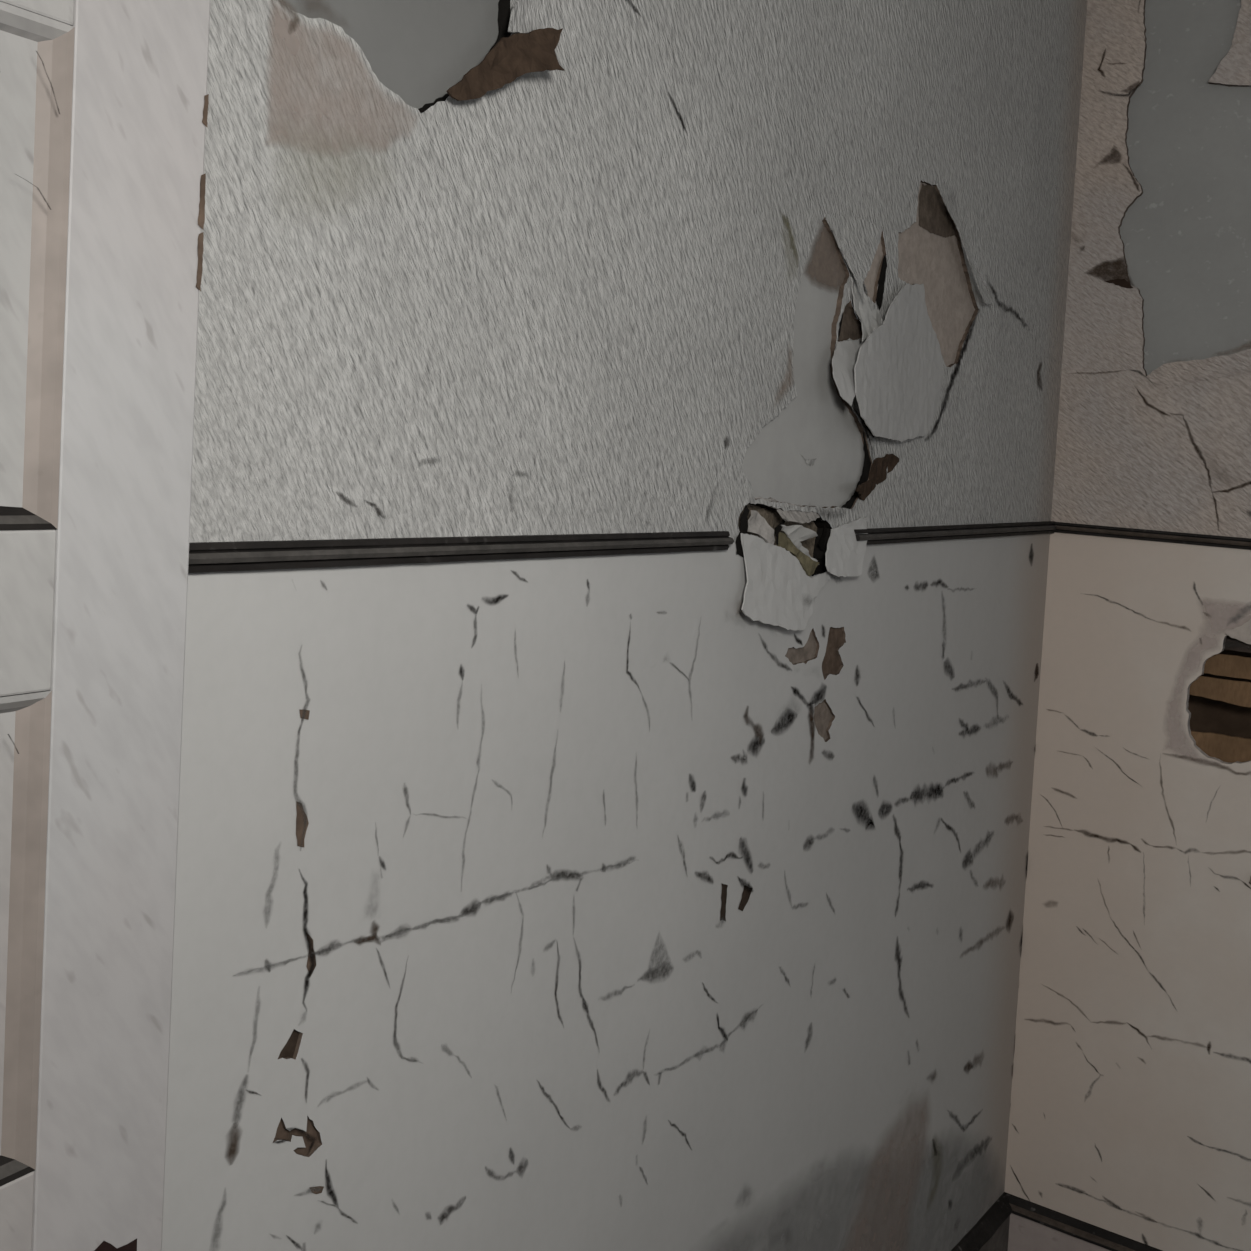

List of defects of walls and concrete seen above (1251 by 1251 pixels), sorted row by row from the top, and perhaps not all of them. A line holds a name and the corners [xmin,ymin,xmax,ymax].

peeling [284,0,565,113]
peeling [1088,0,1251,389]
peeling [732,180,1026,761]
crack [458,571,525,707]
flaking render [1169,603,1251,756]
crack [294,669,310,847]
crack [853,765,1018,1010]
crack [277,878,415,1098]
peeling [95,1239,137,1251]
crack [227,1080,258,1158]
crack [308,1167,354,1222]
damp [727,1148,992,1251]